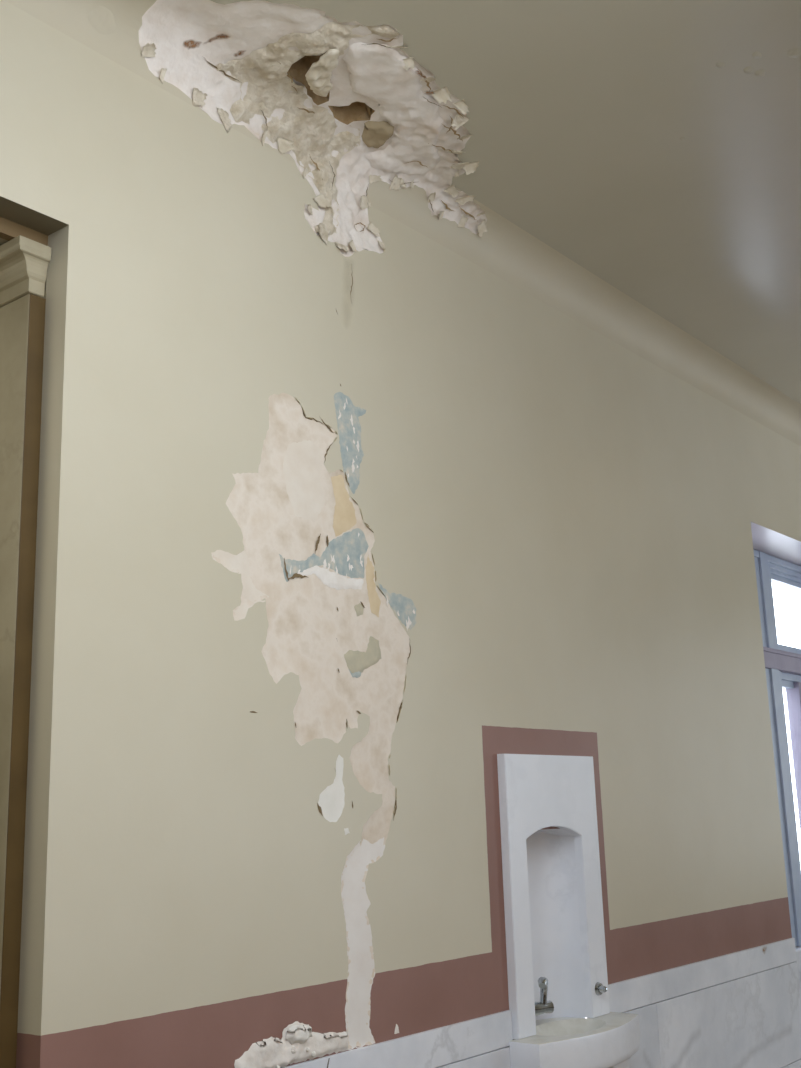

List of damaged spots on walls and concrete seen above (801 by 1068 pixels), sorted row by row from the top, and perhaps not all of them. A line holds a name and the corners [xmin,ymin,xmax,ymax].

peeling [211,392,416,1068]